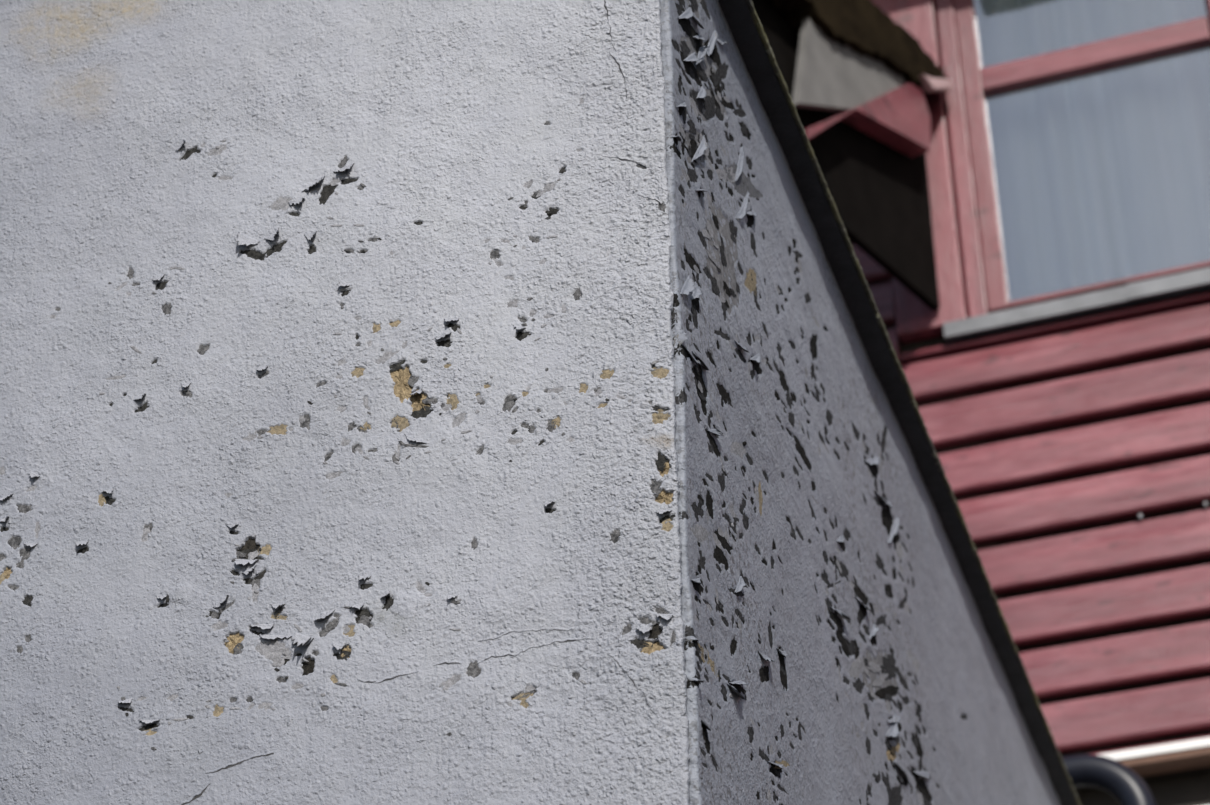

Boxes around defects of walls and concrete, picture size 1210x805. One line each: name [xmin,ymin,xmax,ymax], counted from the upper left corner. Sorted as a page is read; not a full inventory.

crack [604,0,629,97]
peeling [236,227,287,261]
peeling [269,156,382,254]
peeling [485,235,557,281]
peeling [507,297,567,341]
peeling [243,401,313,442]
spalling [316,317,493,480]
peeling [502,386,575,446]
peeling [621,0,940,805]
peeling [0,471,40,607]
peeling [206,523,394,690]
crack [179,750,274,805]